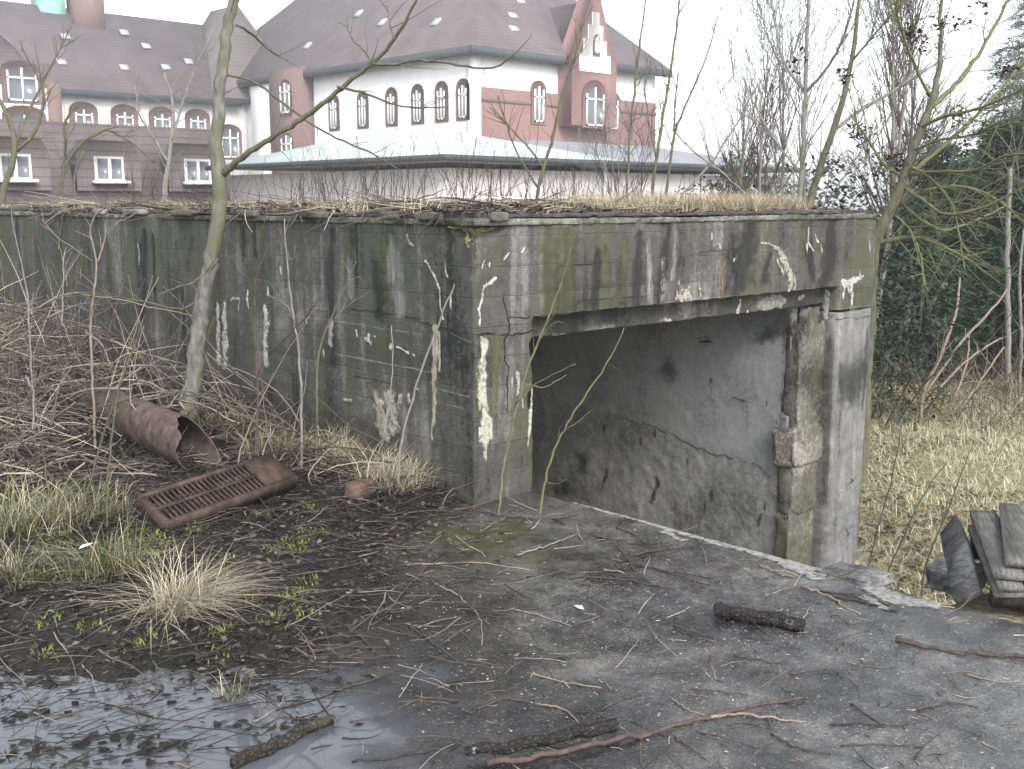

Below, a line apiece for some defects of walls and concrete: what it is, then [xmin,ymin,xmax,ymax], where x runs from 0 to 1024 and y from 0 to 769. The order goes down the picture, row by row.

water stain [137,229,156,320]
water stain [711,222,756,314]
spalling [757,242,805,311]
peeling [842,273,861,306]
crack [346,260,536,411]
spalling [373,388,420,444]
spalling [855,584,943,610]